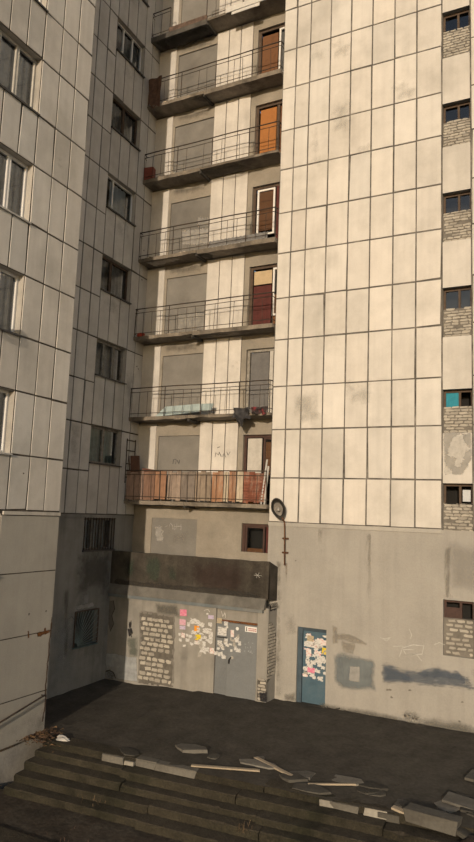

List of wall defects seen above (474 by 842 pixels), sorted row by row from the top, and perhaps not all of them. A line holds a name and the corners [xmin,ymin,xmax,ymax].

peeling [444,432,471,475]